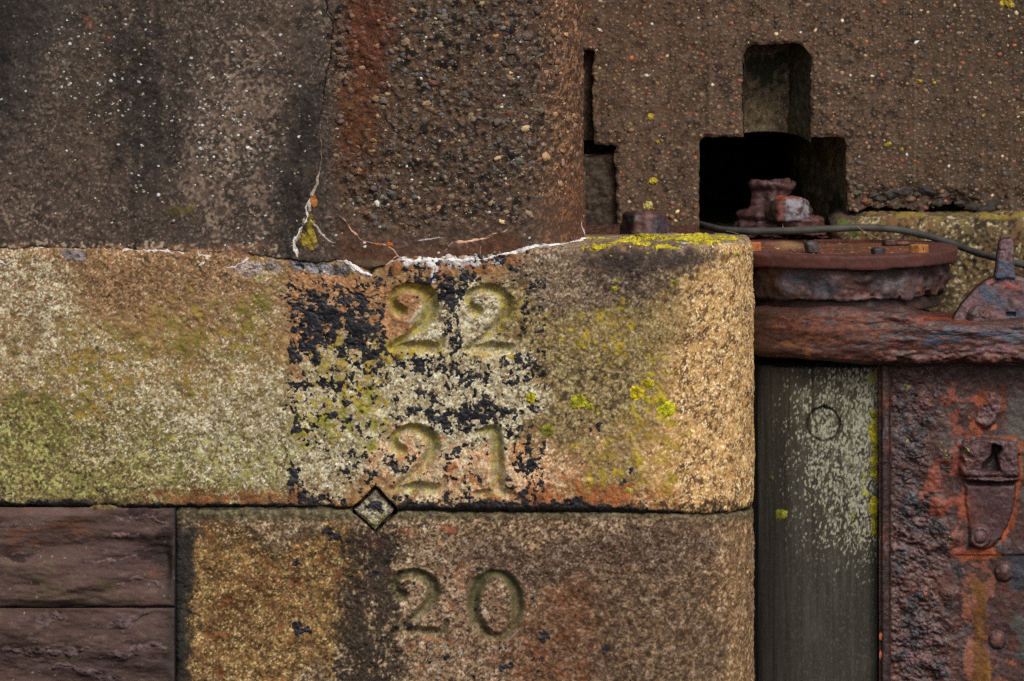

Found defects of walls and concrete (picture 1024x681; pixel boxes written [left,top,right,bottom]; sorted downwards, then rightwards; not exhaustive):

crack [285,0,507,264]
rust [1005,436,1023,529]